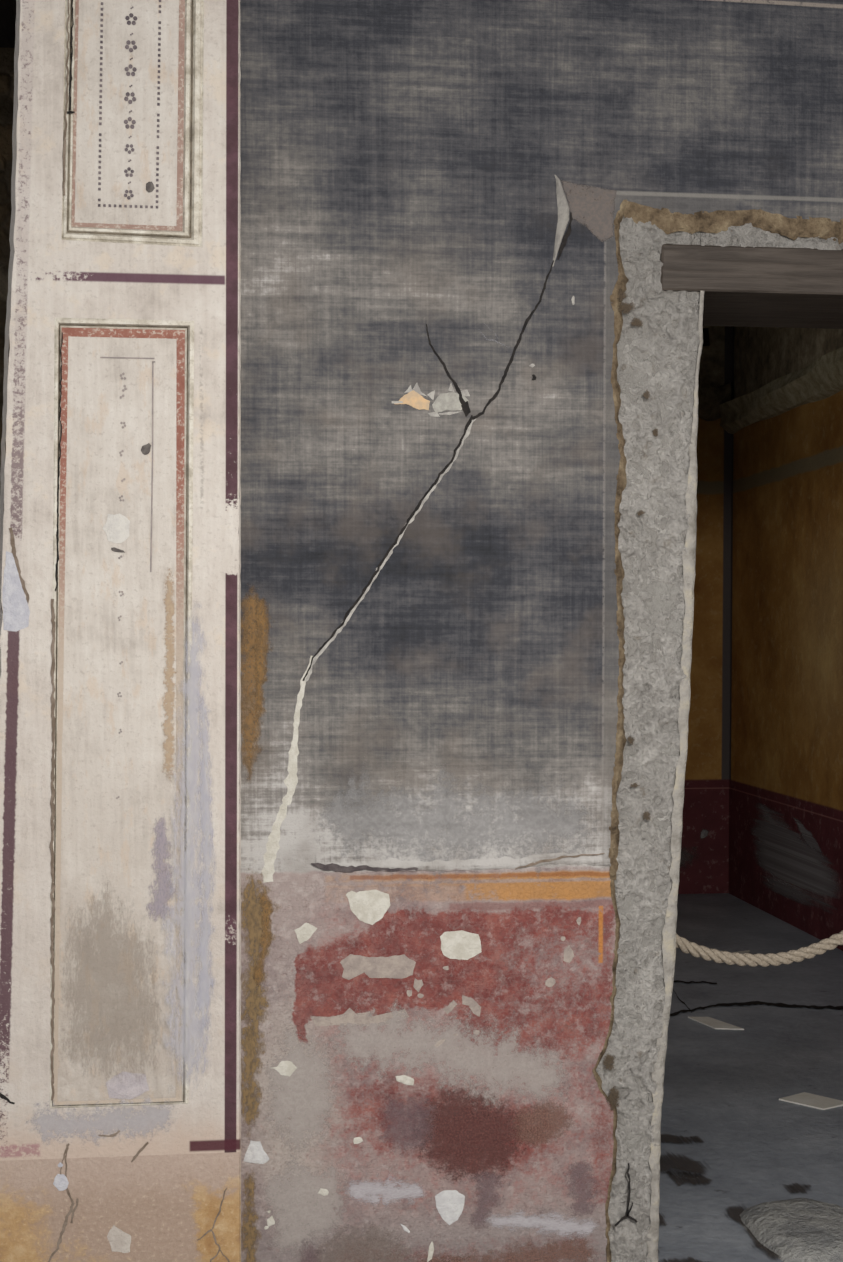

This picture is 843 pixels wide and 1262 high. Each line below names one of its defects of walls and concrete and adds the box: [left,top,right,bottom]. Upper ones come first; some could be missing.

flaking render [552,175,573,267]
crack [261,225,569,883]
flaking render [311,200,843,1262]
peeling [295,923,317,944]
crack [99,1130,148,1162]
crack [48,1143,78,1262]
crack [197,1188,230,1262]
crack [615,1163,638,1227]